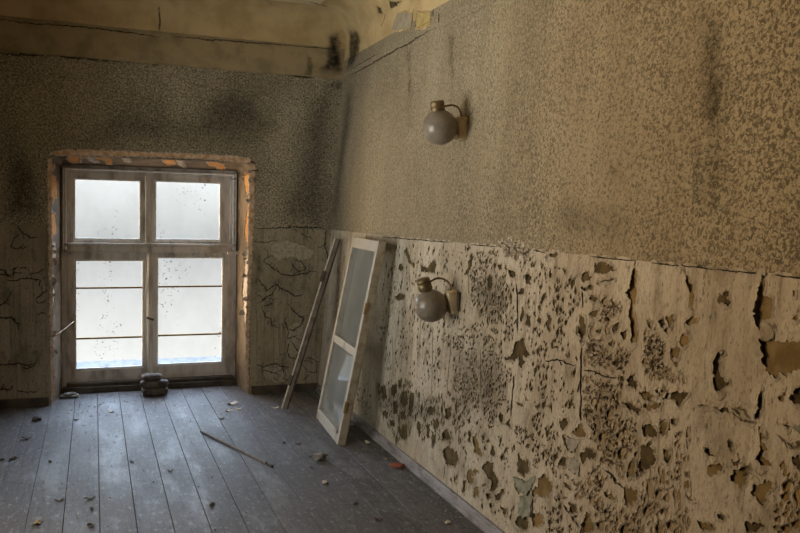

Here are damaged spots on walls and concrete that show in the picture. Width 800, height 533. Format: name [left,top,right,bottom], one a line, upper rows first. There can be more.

mould [325,32,359,70]
crack [352,14,439,74]
crack [0,226,48,330]
flaking render [47,149,256,397]
crack [253,220,328,381]
crack [0,358,38,393]
peeling [357,236,800,533]